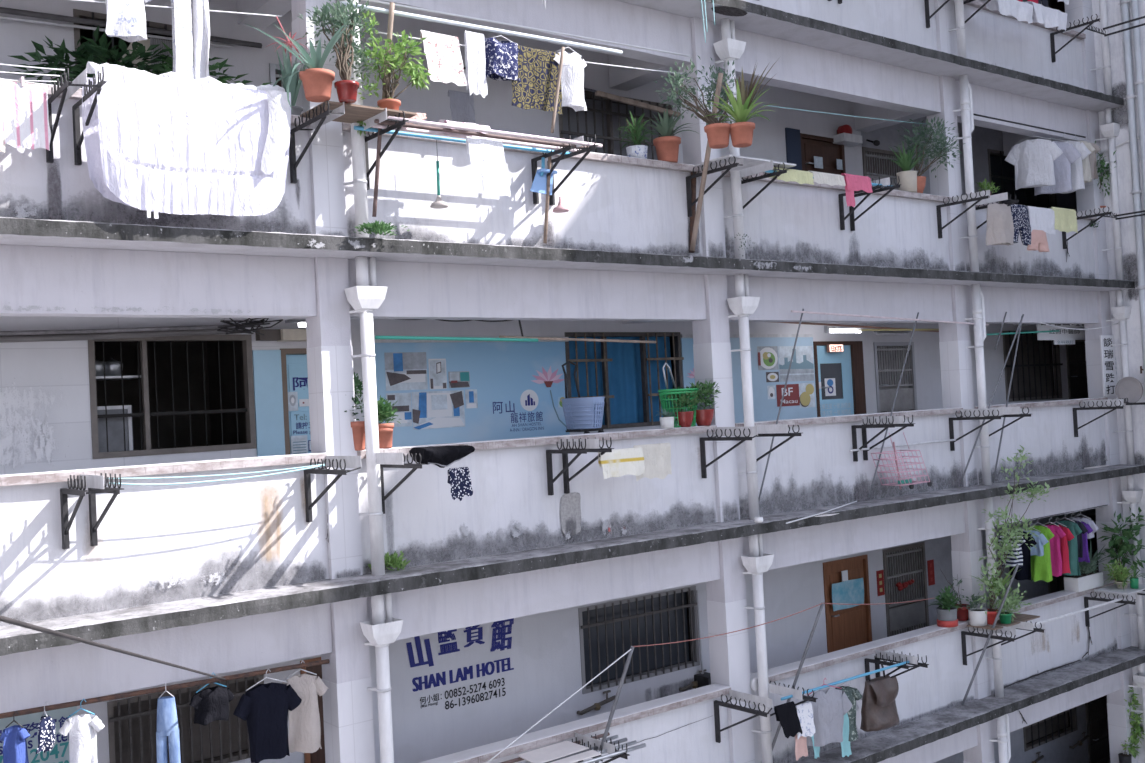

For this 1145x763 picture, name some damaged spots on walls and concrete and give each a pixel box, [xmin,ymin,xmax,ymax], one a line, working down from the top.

leakage [0,163,310,234]
leakage [349,223,450,242]
leakage [508,223,1095,279]
leakage [0,444,1106,626]